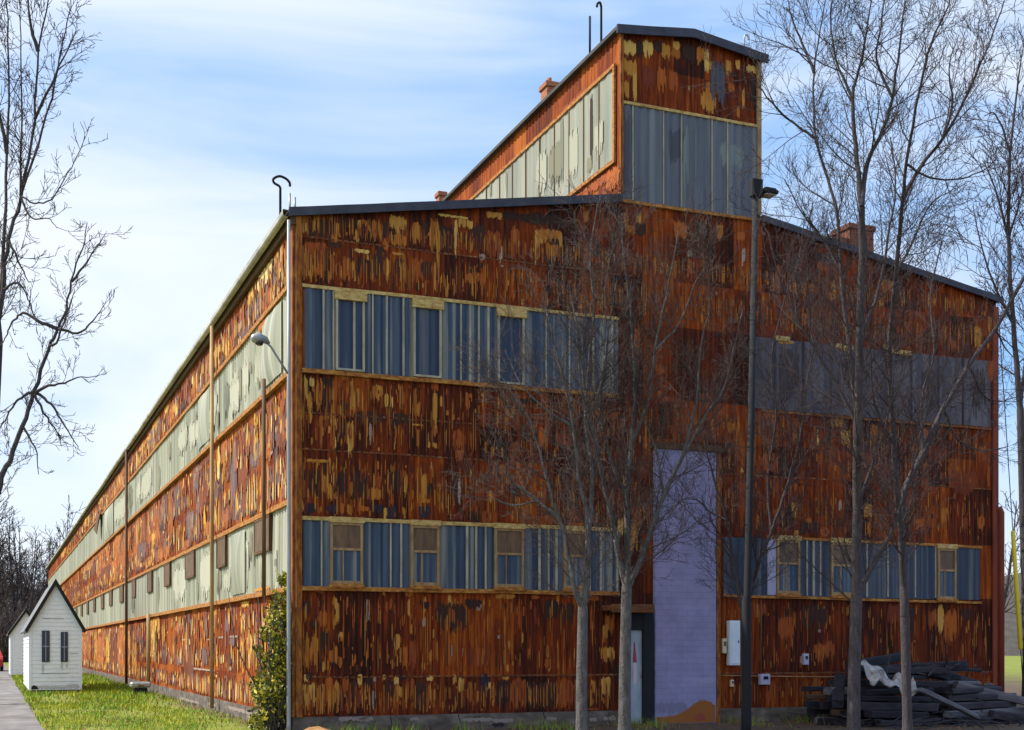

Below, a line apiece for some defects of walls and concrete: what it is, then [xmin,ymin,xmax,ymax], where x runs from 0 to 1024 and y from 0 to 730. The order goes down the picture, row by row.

peeling [624,40,653,58]
peeling [302,213,532,305]
peeling [511,229,775,322]
rust [303,214,988,375]
rust [65,241,287,553]
rust [66,388,287,603]
peeling [66,397,287,599]
peeling [302,375,623,535]
rust [302,376,991,540]
rust [82,602,282,705]
spalling [302,592,514,723]
rust [303,591,615,715]